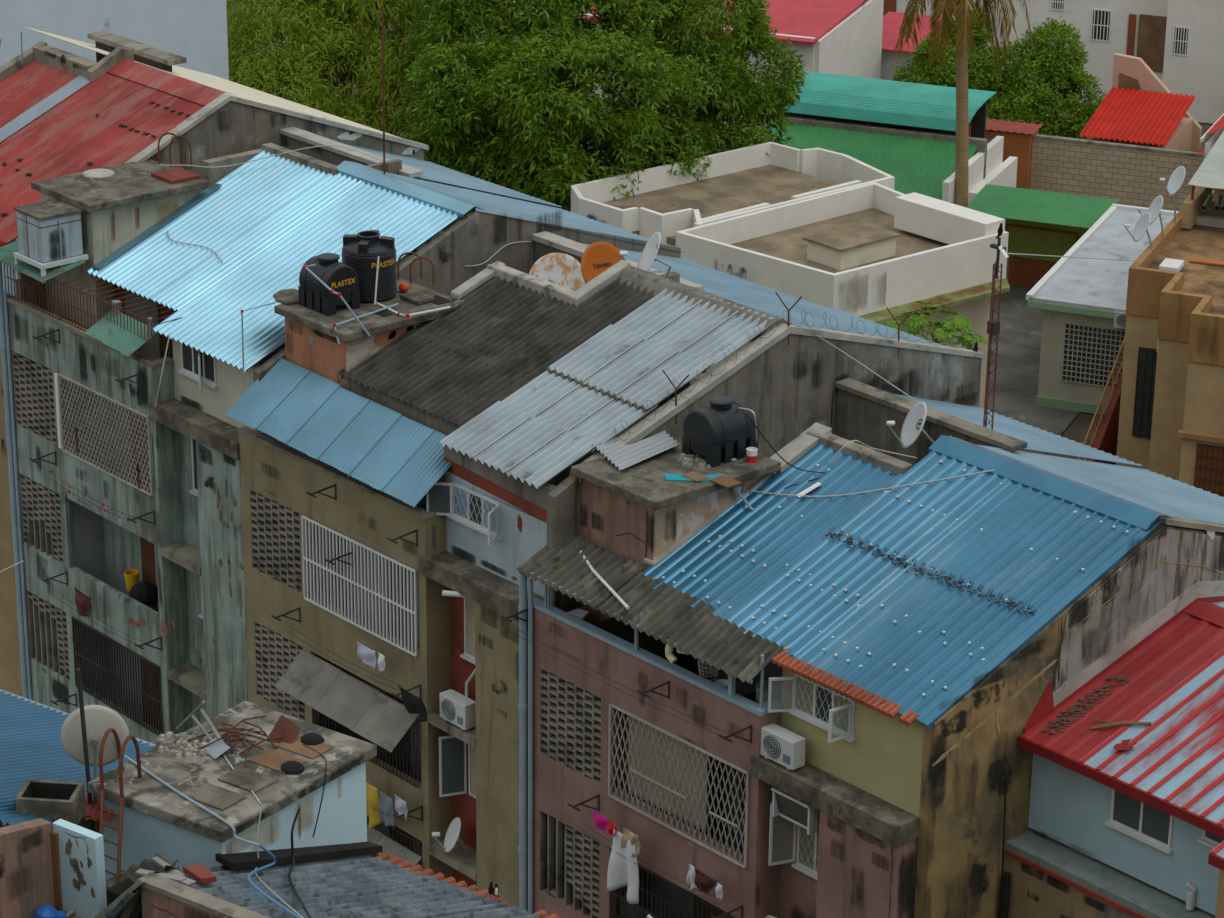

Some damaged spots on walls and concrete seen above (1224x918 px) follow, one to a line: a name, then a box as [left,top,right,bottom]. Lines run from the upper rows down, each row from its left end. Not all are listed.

leakage [79,346,95,379]
leakage [117,369,148,405]
leakage [181,396,201,410]
leakage [199,445,236,489]
leakage [1071,517,1168,654]
leakage [928,667,1005,808]
leakage [971,740,1017,796]
leakage [964,864,989,915]
leakage [1022,863,1068,892]
leakage [1085,896,1105,912]